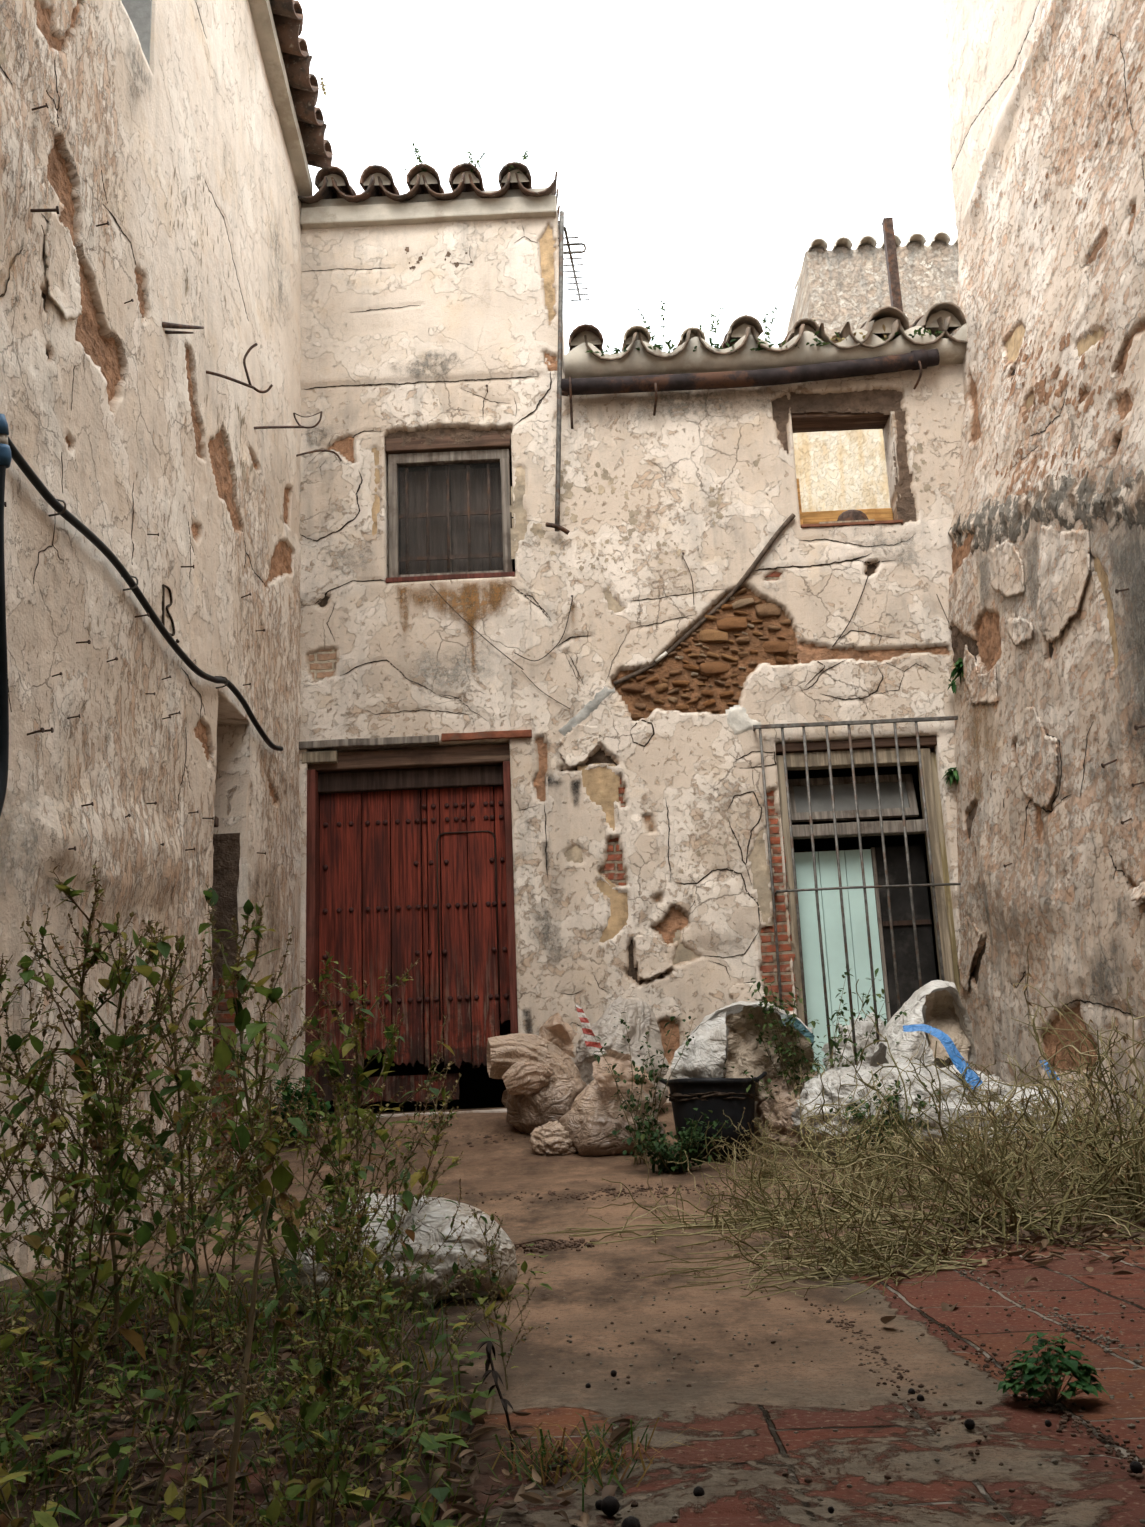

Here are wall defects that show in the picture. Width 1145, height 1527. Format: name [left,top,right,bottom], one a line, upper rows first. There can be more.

crack [0,214,49,297]
peeling [41,140,121,402]
spalling [185,348,257,532]
crack [300,430,373,544]
crack [315,579,486,720]
crack [305,371,552,425]
crack [507,583,721,681]
crack [755,535,914,571]
spalling [612,525,1119,721]
spalling [533,724,700,985]
spalling [679,791,798,1011]
spalling [1043,1002,1098,1072]